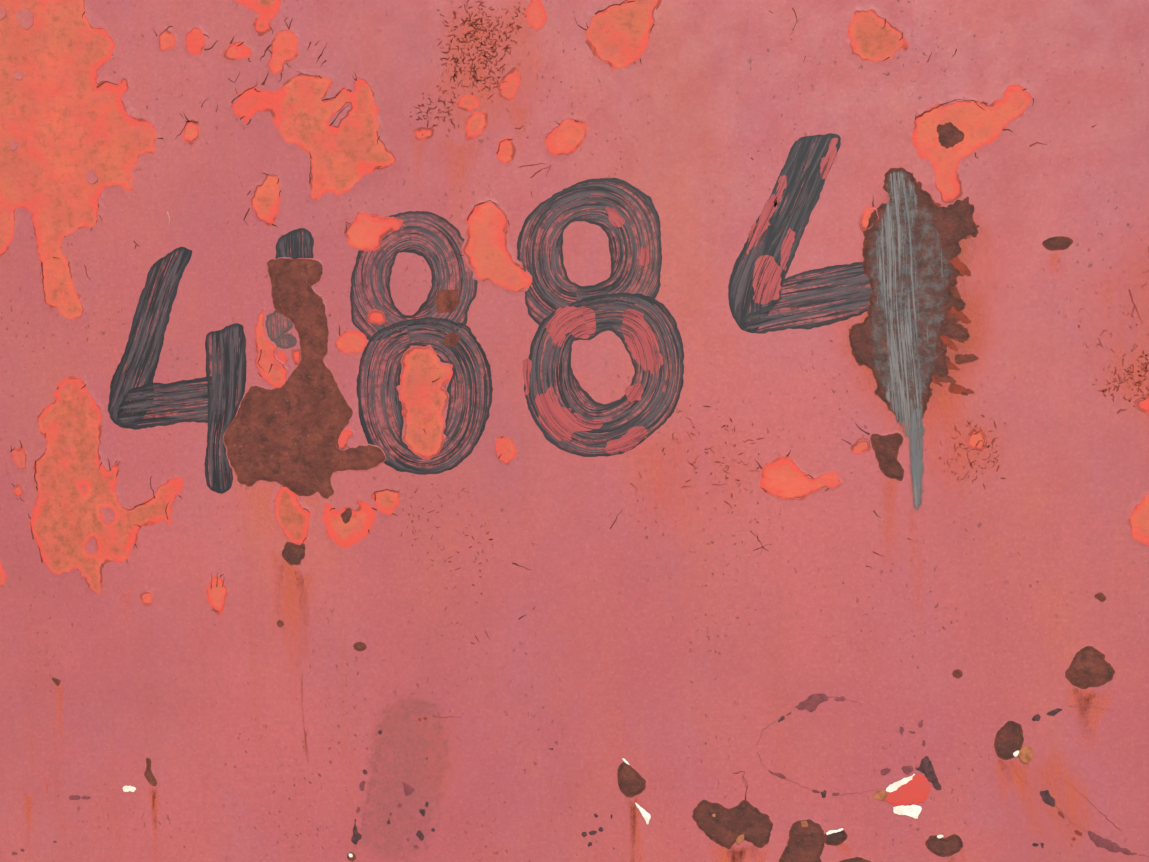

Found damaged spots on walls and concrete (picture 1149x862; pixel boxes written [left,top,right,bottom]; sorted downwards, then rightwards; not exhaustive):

peeling [0,0,203,326]
peeling [152,0,403,206]
peeling [904,77,1041,207]
peeling [344,211,404,252]
peeling [457,196,532,296]
rust [223,257,387,500]
peeling [396,344,453,460]
rust [849,167,980,483]
peeling [7,370,188,601]
rust [1063,643,1117,725]
rust [690,776,874,862]
peeling [873,720,941,819]